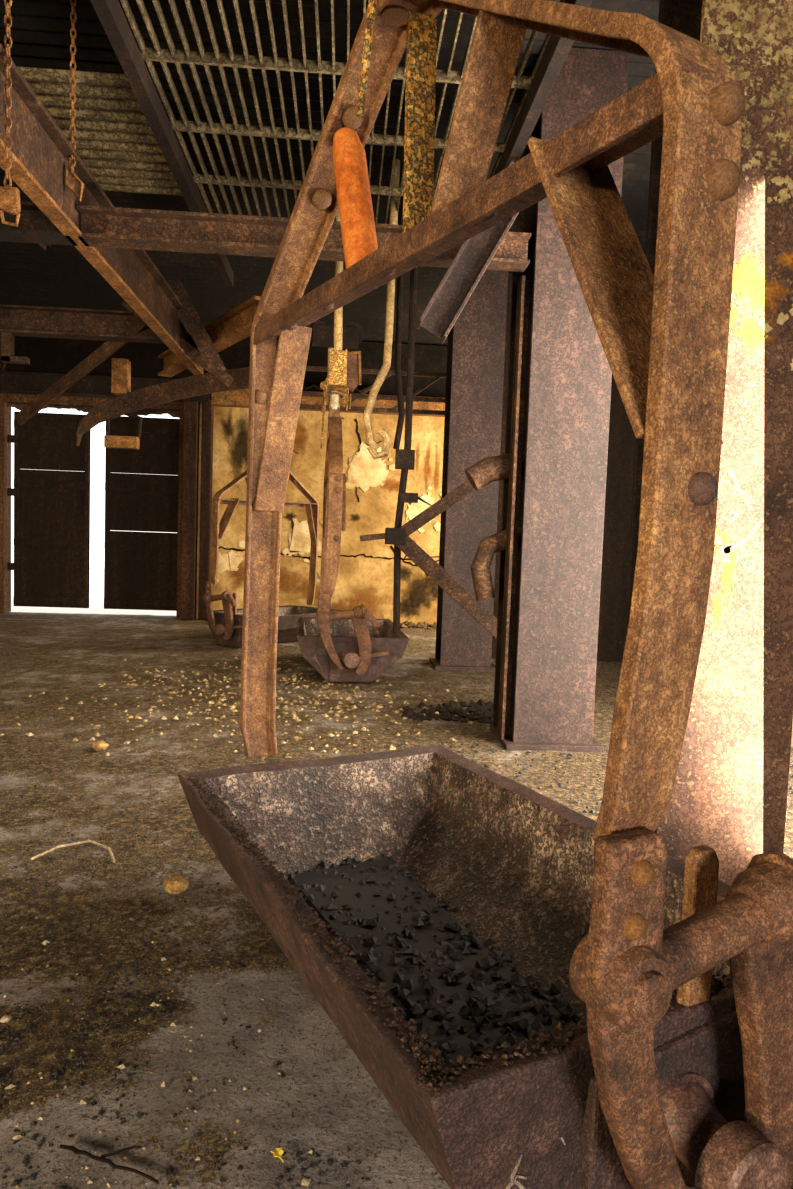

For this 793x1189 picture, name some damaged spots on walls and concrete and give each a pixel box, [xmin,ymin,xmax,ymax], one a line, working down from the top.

corrosion [779,253,793,266]
corrosion [732,261,788,312]
corrosion [730,309,772,347]
water stain [224,417,248,476]
water stain [294,422,306,448]
water stain [232,565,244,587]
water stain [330,589,383,614]
water stain [400,567,438,616]
corrosion [714,532,734,616]